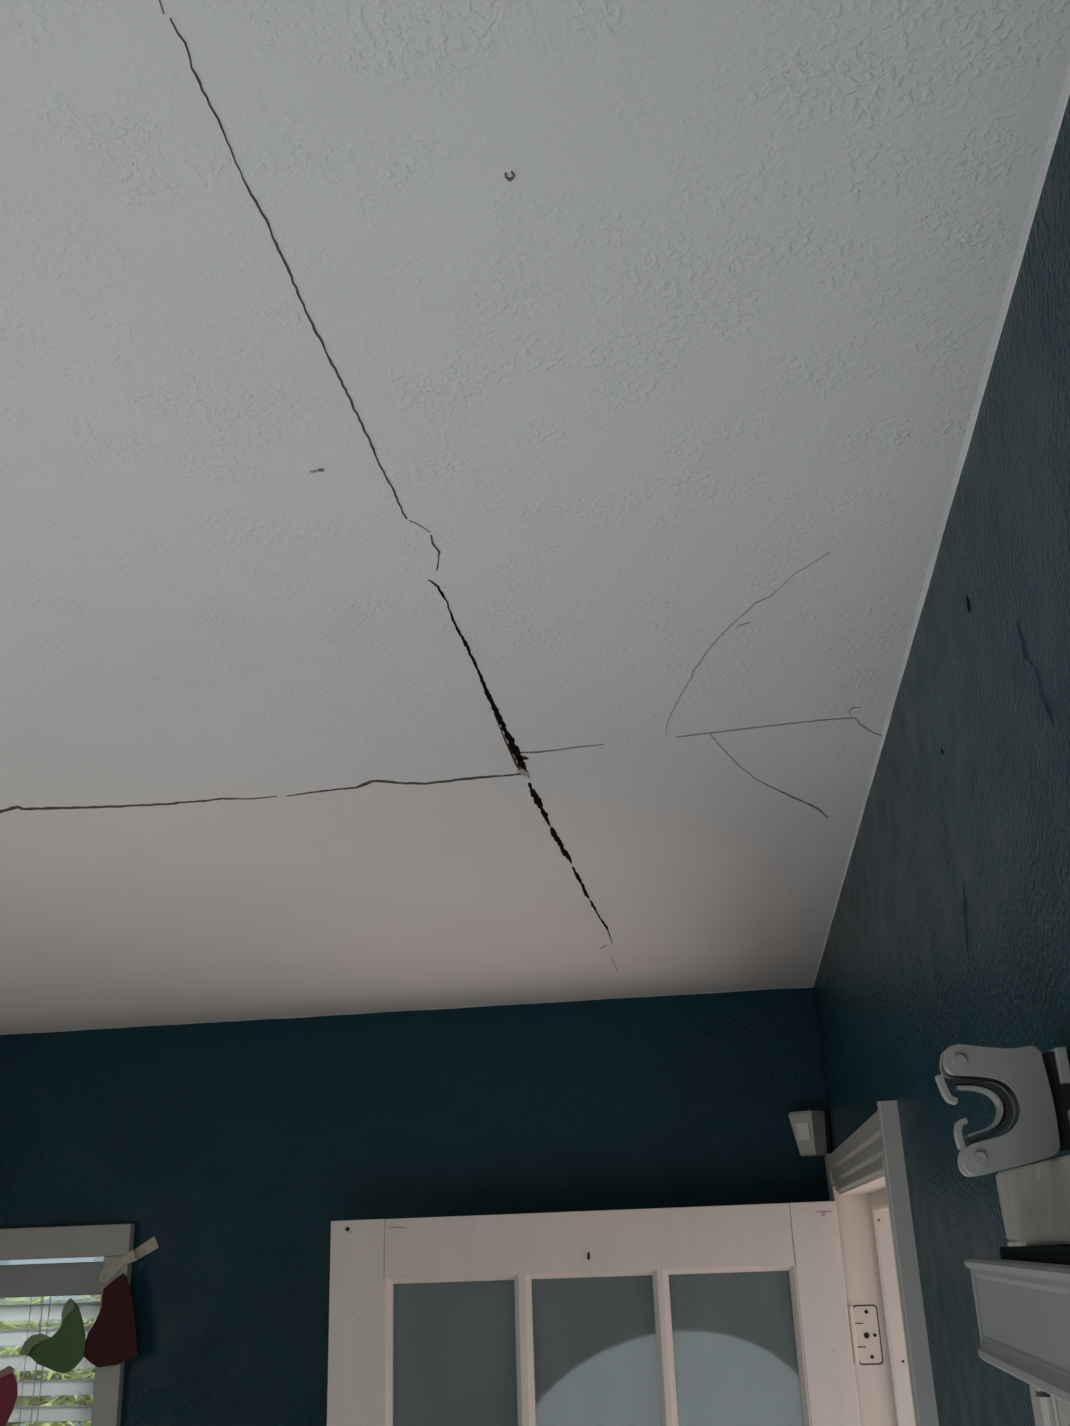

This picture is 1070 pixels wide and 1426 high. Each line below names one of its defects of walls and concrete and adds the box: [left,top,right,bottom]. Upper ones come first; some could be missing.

crack [0,0,618,971]
crack [666,552,882,818]